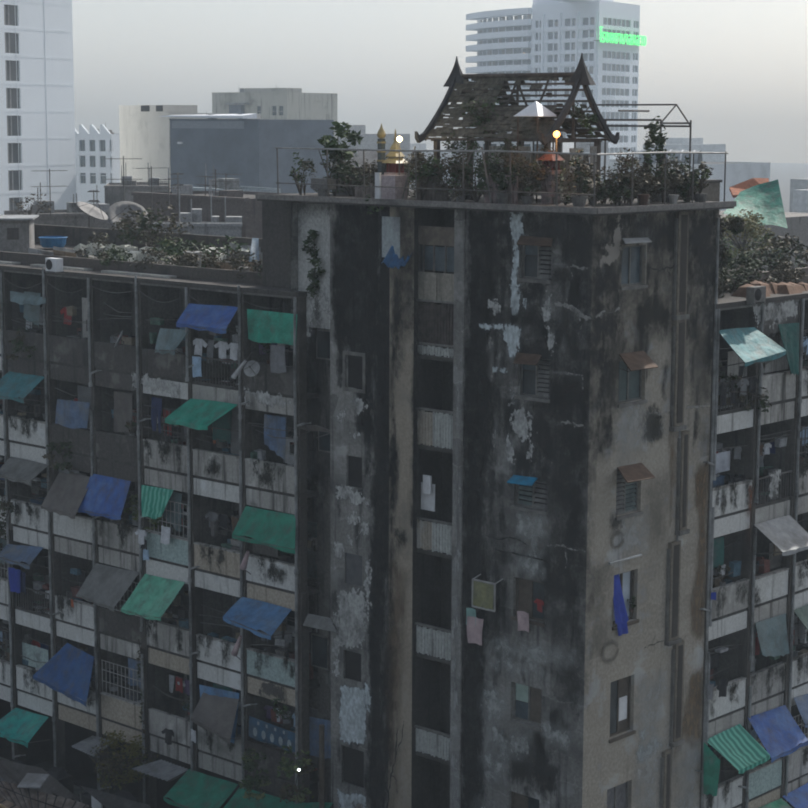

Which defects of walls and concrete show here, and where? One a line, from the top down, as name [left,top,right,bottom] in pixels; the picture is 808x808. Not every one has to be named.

peeling [479,212,527,357]
peeling [753,300,798,329]
damp [329,204,422,808]
damp [451,210,718,808]
peeling [331,558,372,745]
peeling [337,789,366,808]